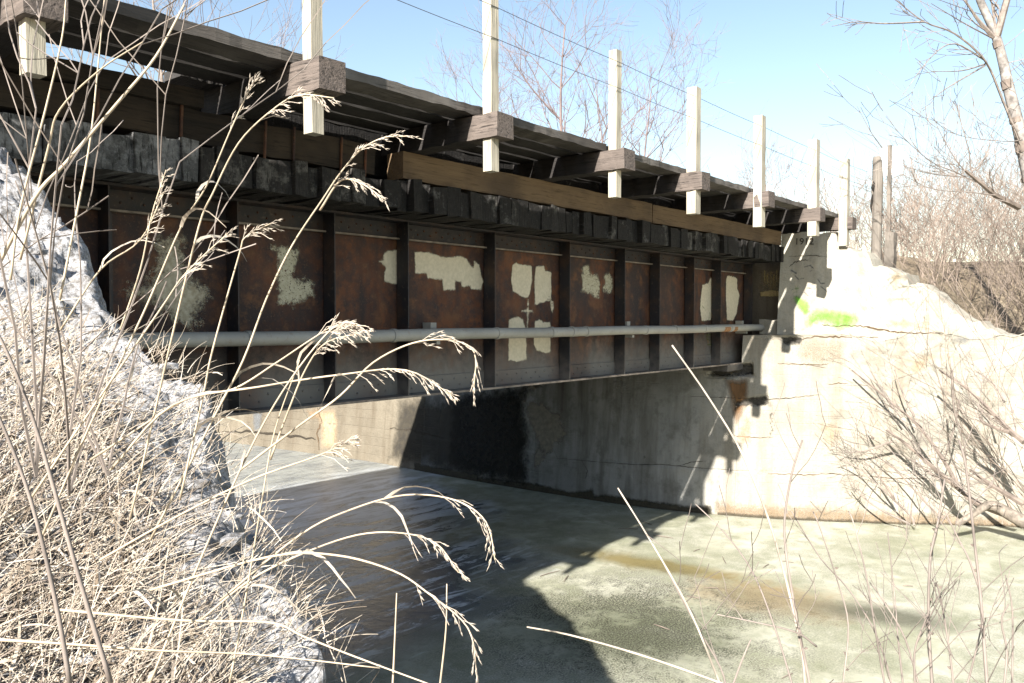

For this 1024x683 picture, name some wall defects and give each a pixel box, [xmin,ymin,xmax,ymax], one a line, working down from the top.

crack [804,324,941,339]
corrosion [728,381,747,419]
crack [223,408,322,447]
damp [415,391,1019,527]